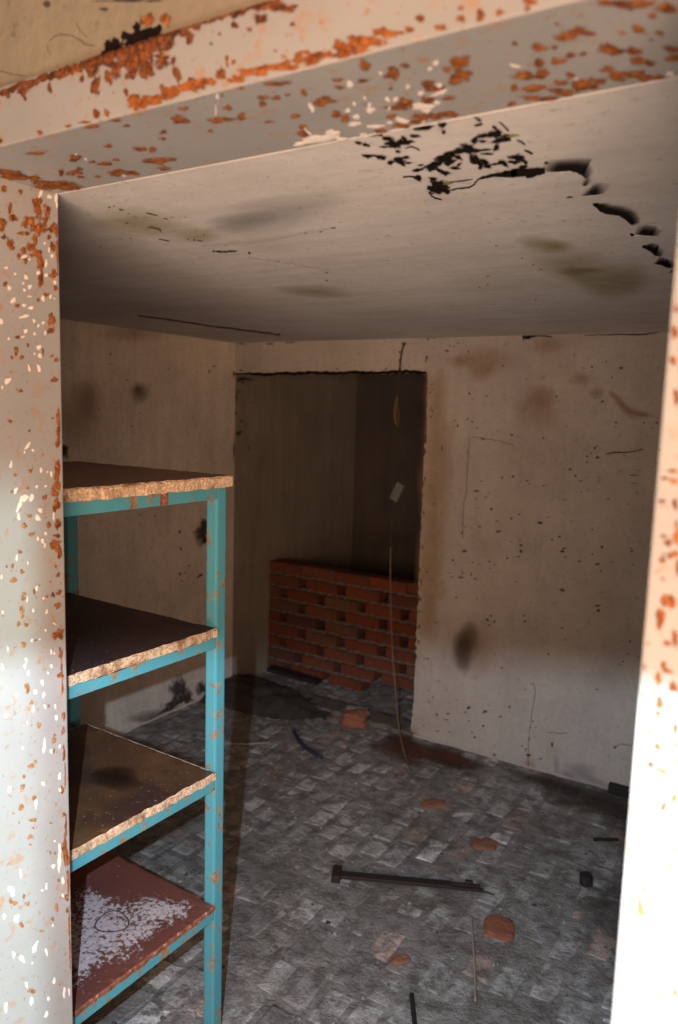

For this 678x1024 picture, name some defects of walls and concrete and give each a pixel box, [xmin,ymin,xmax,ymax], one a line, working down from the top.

spalling [345,83,533,200]
crack [450,161,674,277]
peeling [4,241,57,372]
peeling [14,467,55,548]
peeling [27,649,58,724]
leakage [144,677,206,723]
peeling [51,840,65,898]
peeling [12,940,48,964]